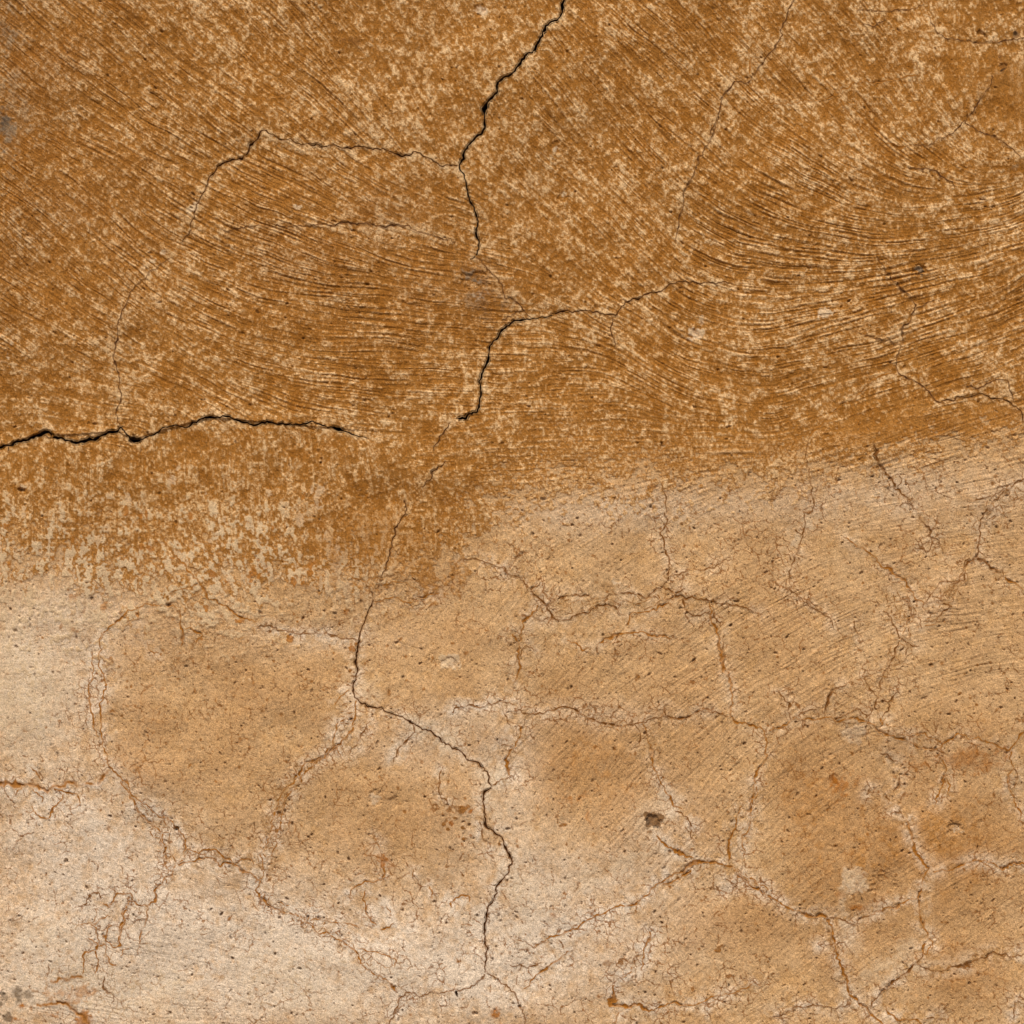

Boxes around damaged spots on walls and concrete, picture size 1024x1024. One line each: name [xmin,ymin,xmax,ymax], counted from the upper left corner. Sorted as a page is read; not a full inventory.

crack [0,0,733,488]
crack [674,0,1024,243]
crack [783,255,1024,643]
crack [0,444,1024,1024]